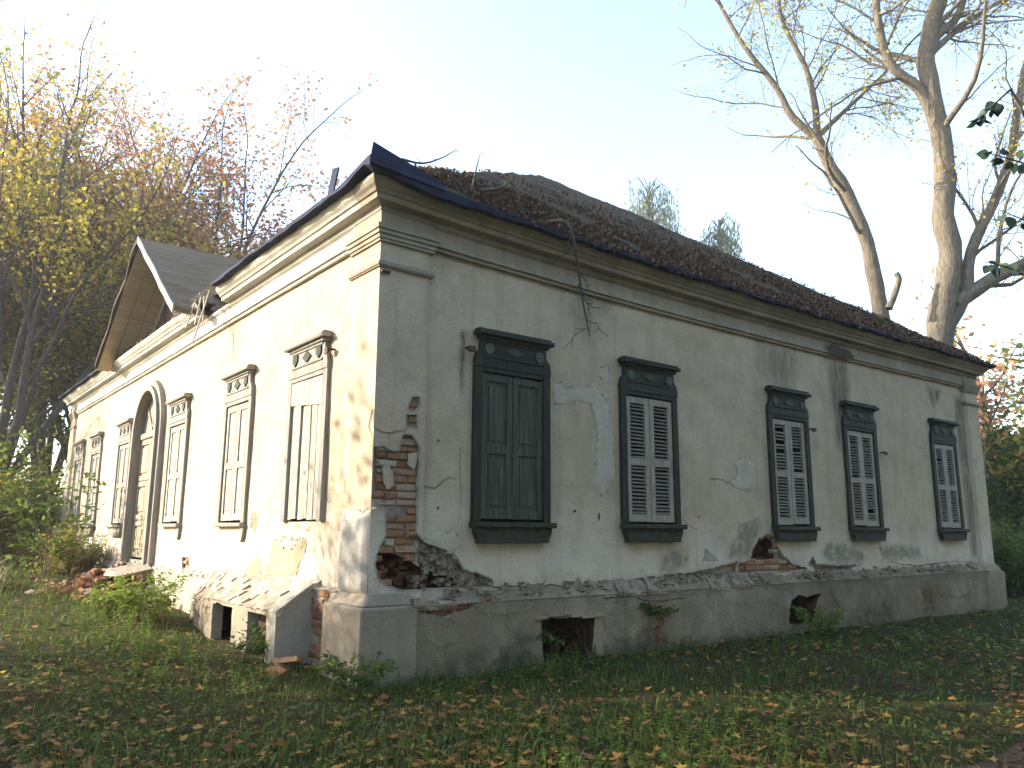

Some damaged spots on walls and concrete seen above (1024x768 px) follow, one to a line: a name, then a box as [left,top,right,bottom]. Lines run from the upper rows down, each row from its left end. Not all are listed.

peeling [553,366,617,495]
spalling [367,395,615,619]
spalling [308,586,346,667]
spalling [632,522,918,646]